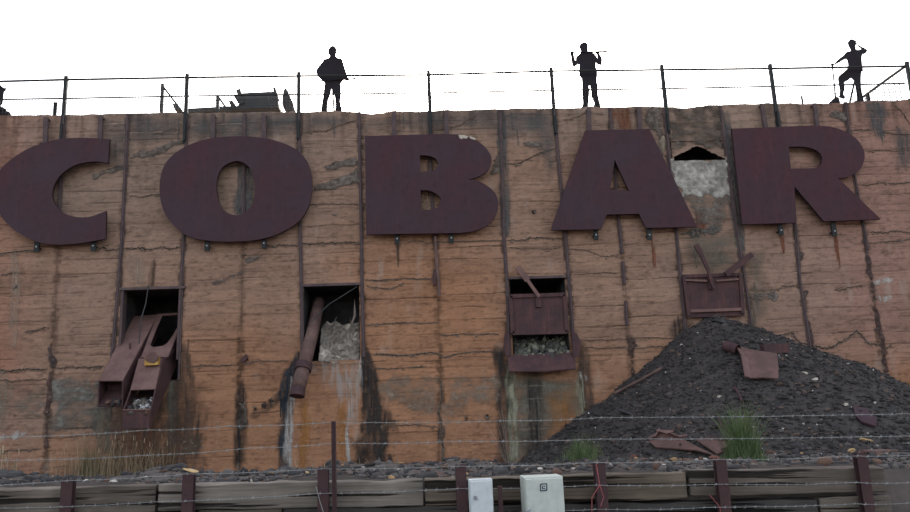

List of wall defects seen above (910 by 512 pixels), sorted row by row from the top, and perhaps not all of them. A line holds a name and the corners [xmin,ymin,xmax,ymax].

crack [851,102,910,153]
peeling [645,105,730,198]
crack [861,179,910,187]
crack [870,230,910,244]
crack [366,276,433,290]
crack [782,329,893,350]
crack [0,365,104,383]
water stain [236,388,245,417]
water stain [267,352,299,467]
water stain [345,351,392,464]
water stain [235,426,246,465]